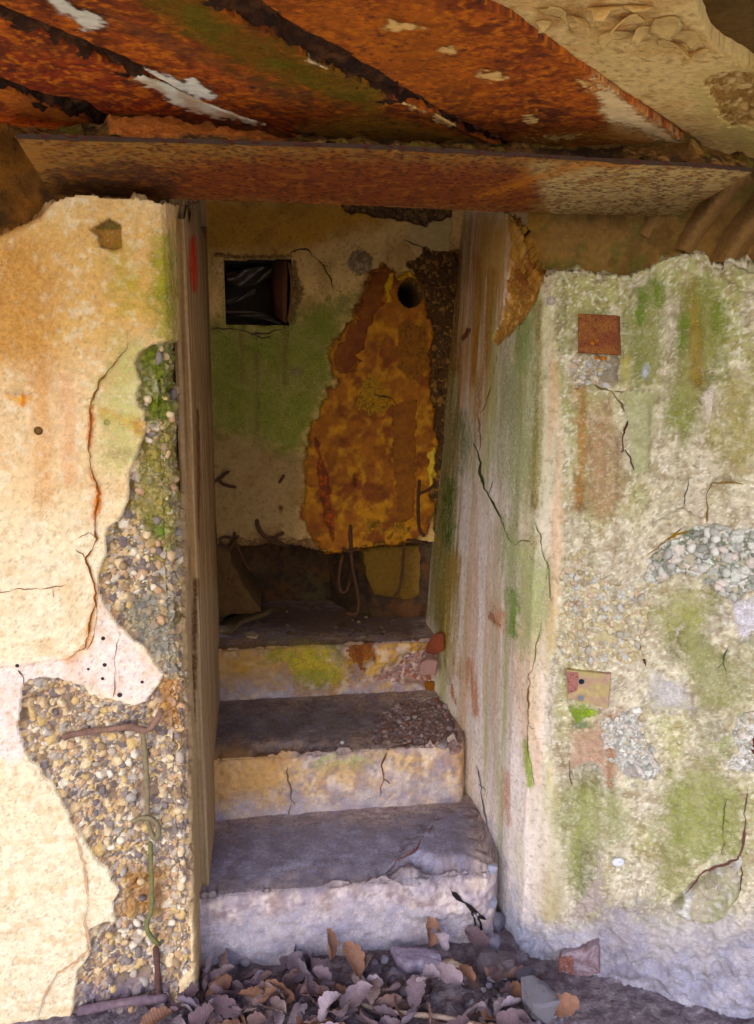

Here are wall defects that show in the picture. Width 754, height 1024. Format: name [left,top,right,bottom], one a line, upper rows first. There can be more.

peeling [577,76,680,143]
spalling [704,71,754,129]
rust [300,264,439,554]
leakage [531,409,540,508]
crack [594,384,634,470]
leakage [702,387,713,419]
crack [0,340,128,696]
crack [473,356,552,784]
spalling [554,523,754,670]
leakage [734,600,754,638]
spalling [18,341,192,1017]
crack [678,789,748,899]